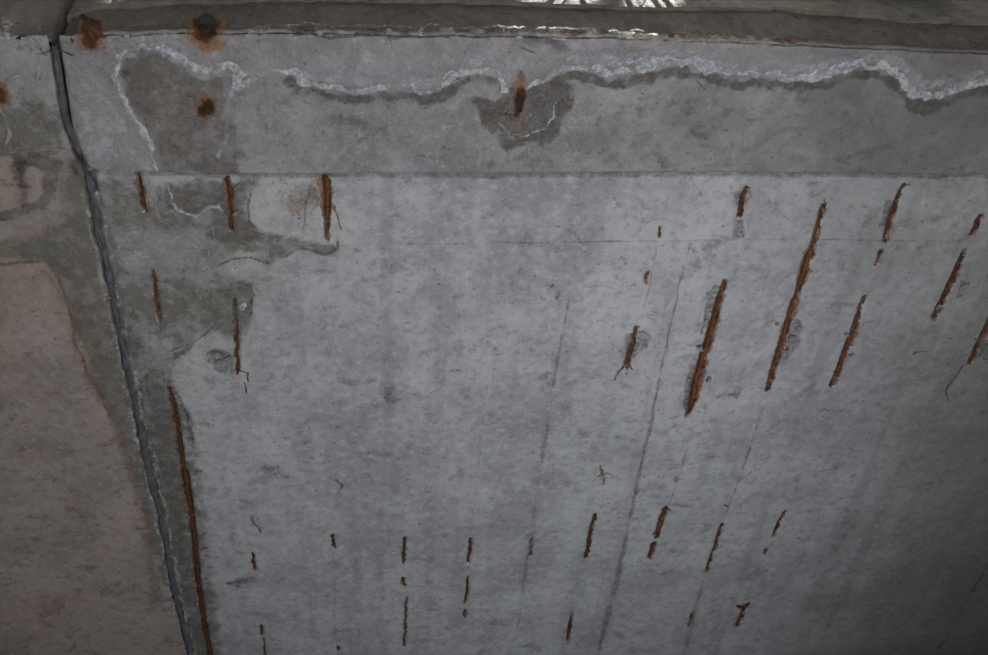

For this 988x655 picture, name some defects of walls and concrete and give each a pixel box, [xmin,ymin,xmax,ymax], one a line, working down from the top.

rust [186,14,227,54]
damp [526,43,988,115]
rust [317,174,341,241]
rust [735,186,750,238]
rust [874,183,910,265]
rust [764,199,827,391]
rust [932,249,968,321]
rust [613,326,647,381]
rust [683,279,727,417]
rust [829,294,867,388]
rust [968,318,988,364]
rust [165,386,212,655]